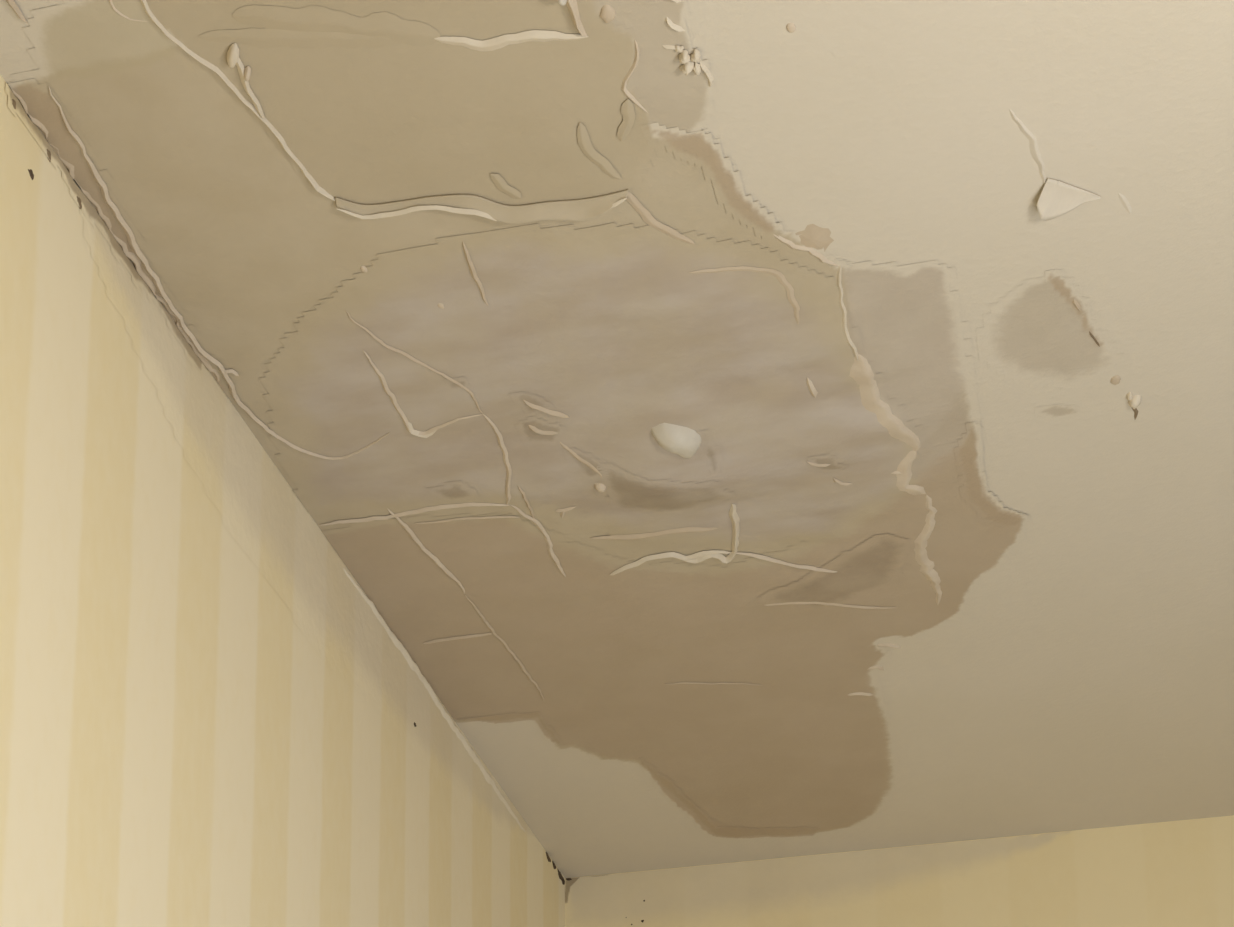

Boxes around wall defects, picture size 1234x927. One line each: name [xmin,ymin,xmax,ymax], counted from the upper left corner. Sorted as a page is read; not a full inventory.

peeling [5,83,220,382]
peeling [109,0,717,224]
damp [7,0,1031,848]
peeling [774,224,942,605]
damp [976,269,1124,391]
damp [546,831,1075,927]